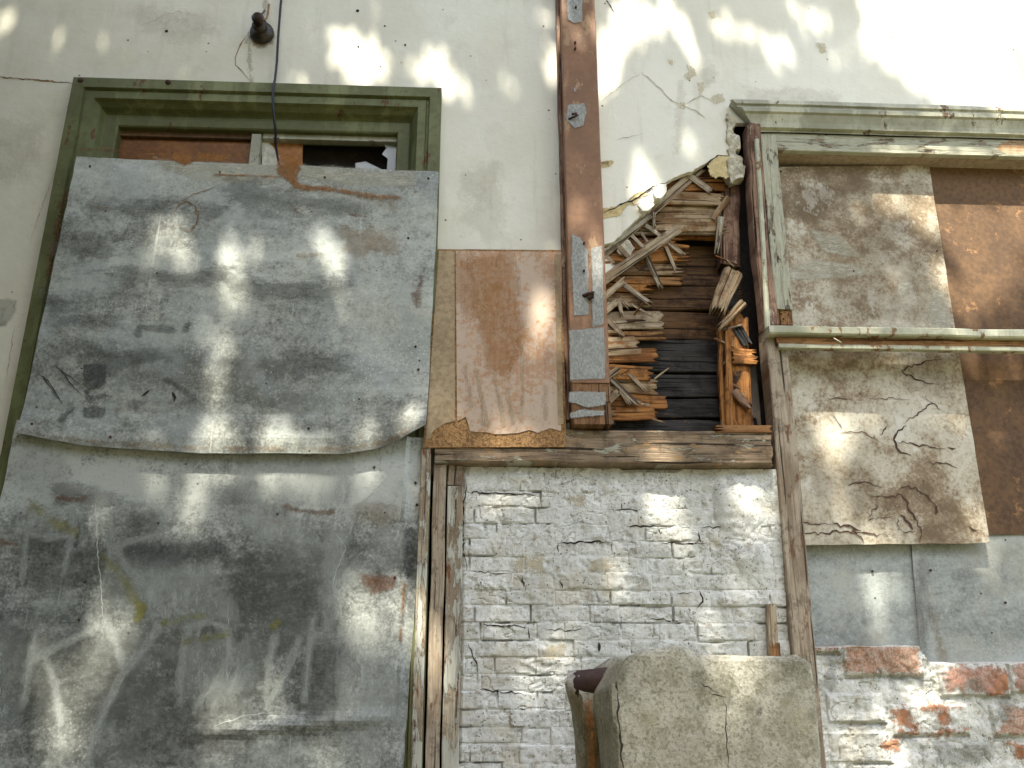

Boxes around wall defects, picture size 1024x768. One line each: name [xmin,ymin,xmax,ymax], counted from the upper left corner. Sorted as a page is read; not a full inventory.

corrosion [214,154,400,199]
flaking render [603,67,766,431]
crack [827,359,958,469]
crack [462,484,534,585]
crack [557,503,720,553]
crack [804,481,938,543]
corrosion [362,575,406,610]
crack [468,645,526,710]
crack [484,624,601,651]
crack [652,592,704,622]
flaking render [815,645,924,677]
flaking render [880,663,1024,762]